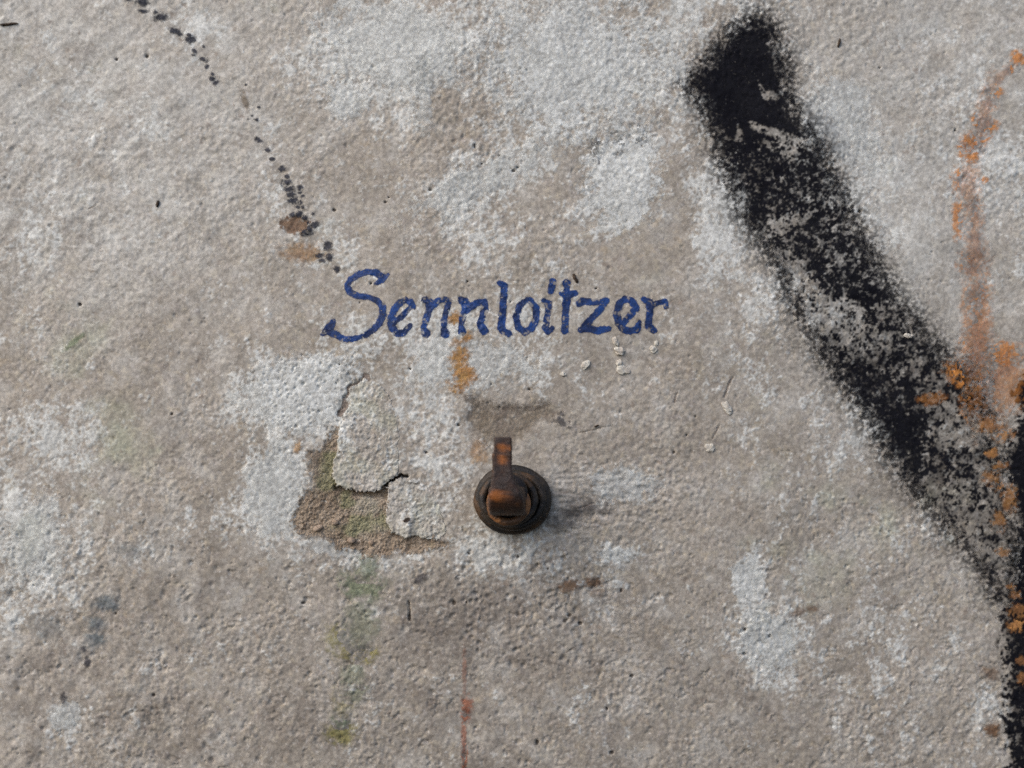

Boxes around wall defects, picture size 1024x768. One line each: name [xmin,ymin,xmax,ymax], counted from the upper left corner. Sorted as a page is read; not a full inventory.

corrosion [957,117,997,176]
corrosion [953,204,972,232]
corrosion [450,334,477,393]
corrosion [948,343,1019,411]
corrosion [981,417,1014,458]
spalling [289,381,449,559]
corrosion [1007,619,1024,633]